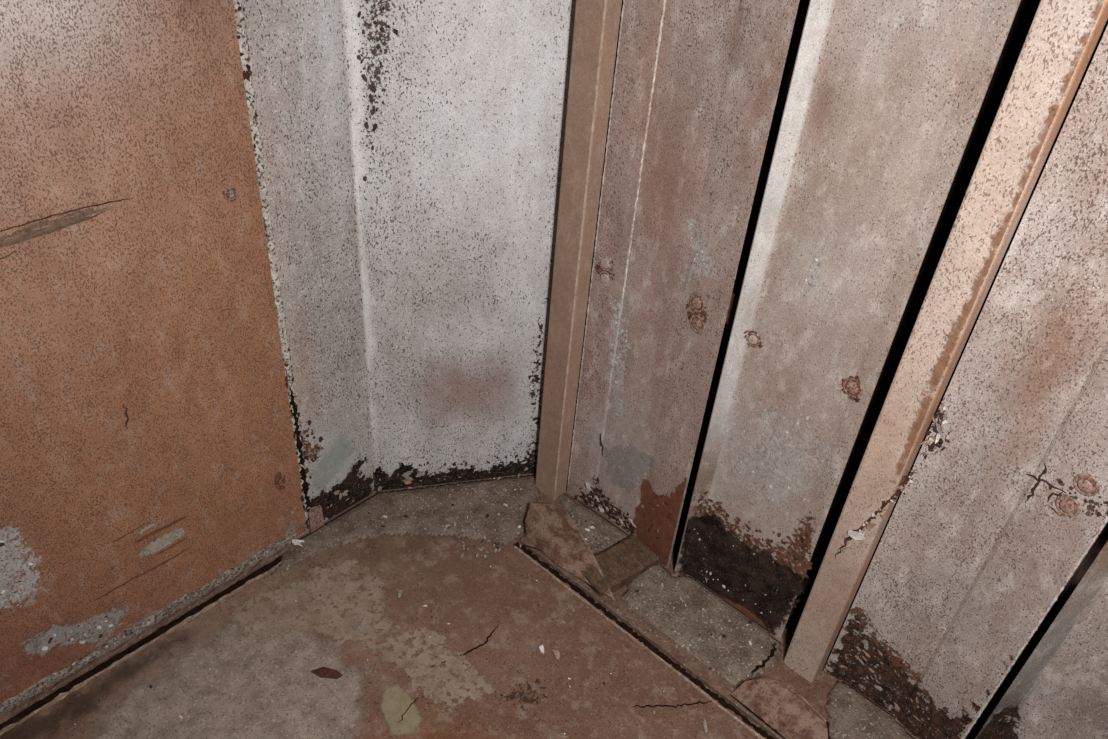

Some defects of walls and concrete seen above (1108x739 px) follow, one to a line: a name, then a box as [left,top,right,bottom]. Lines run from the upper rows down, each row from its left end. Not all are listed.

corrosion [1062,33,1091,93]
corrosion [897,105,1060,475]
peeling [0,519,51,615]
peeling [19,605,131,660]
water stain [0,506,308,716]
water stain [310,442,537,520]
corrosion [633,478,816,582]
water stain [676,514,810,633]
corrosion [1046,472,1108,519]
water stain [979,706,1021,739]